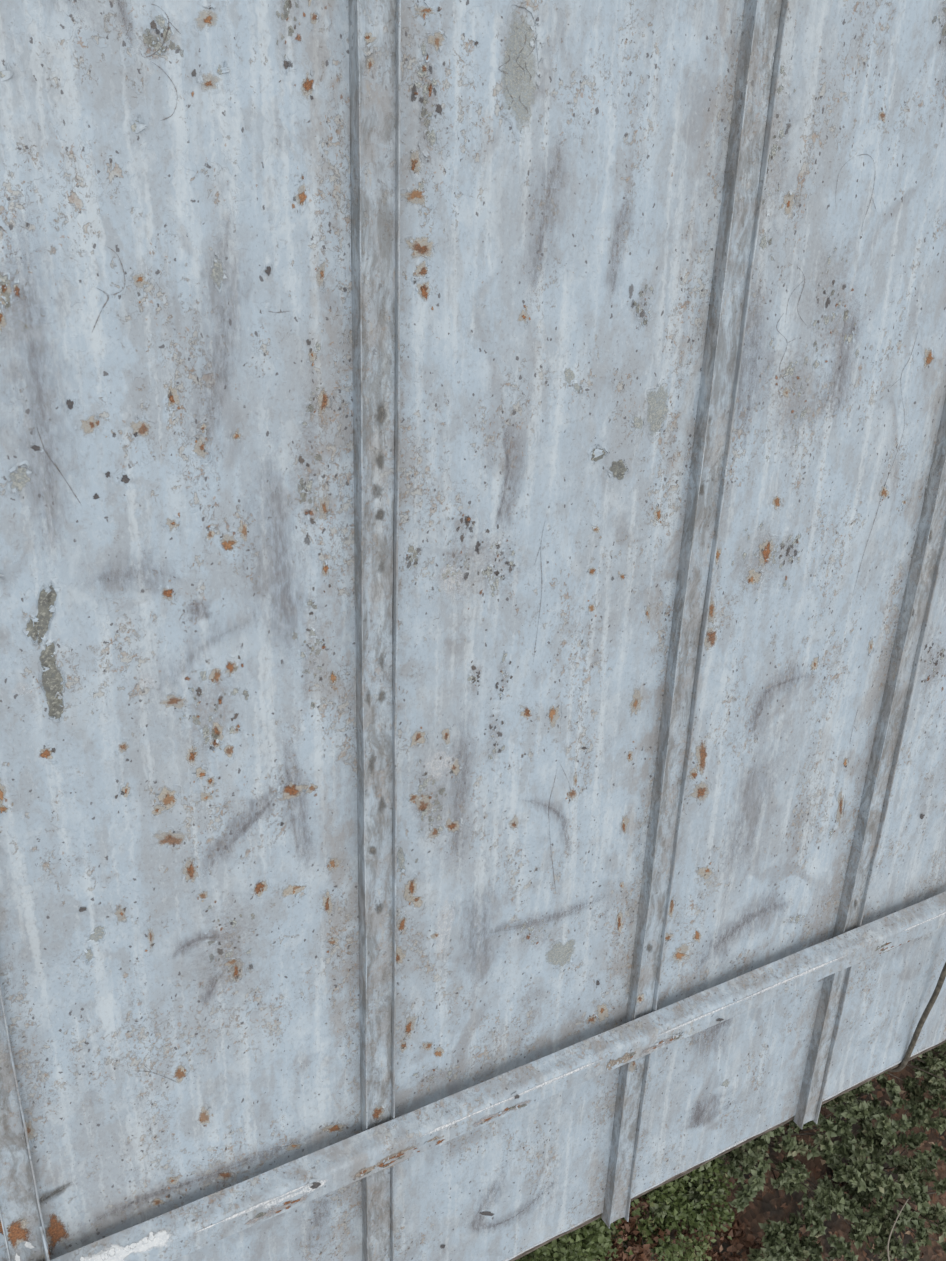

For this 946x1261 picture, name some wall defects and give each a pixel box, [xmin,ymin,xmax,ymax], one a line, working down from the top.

peeling [141,10,180,57]
peeling [499,0,545,143]
peeling [587,445,631,480]
corrosion [741,532,778,588]
peeling [23,580,66,724]
corrosion [205,653,243,690]
corrosion [163,690,192,717]
corrosion [149,715,254,850]
corrosion [274,778,319,805]
corrosion [177,854,208,902]
peeling [519,918,576,972]
corrosion [0,1213,69,1261]